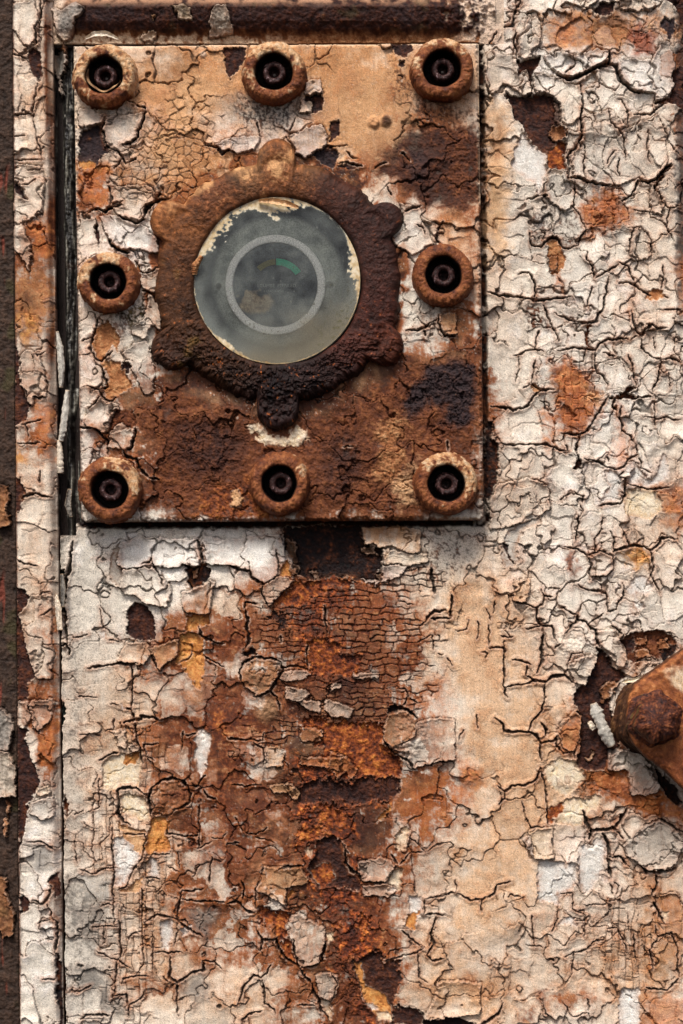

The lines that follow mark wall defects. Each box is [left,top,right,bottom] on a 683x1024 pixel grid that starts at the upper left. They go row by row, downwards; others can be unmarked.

peeling [13,165,48,274]
crack [82,101,174,298]
rust [127,56,236,189]
rust [308,59,480,222]
crack [484,0,564,62]
peeling [479,0,683,217]
rust [132,347,483,521]
crack [378,46,683,1024]
peeling [0,561,75,861]
crack [17,534,342,1024]
rust [137,596,322,903]
peeling [91,521,484,1024]